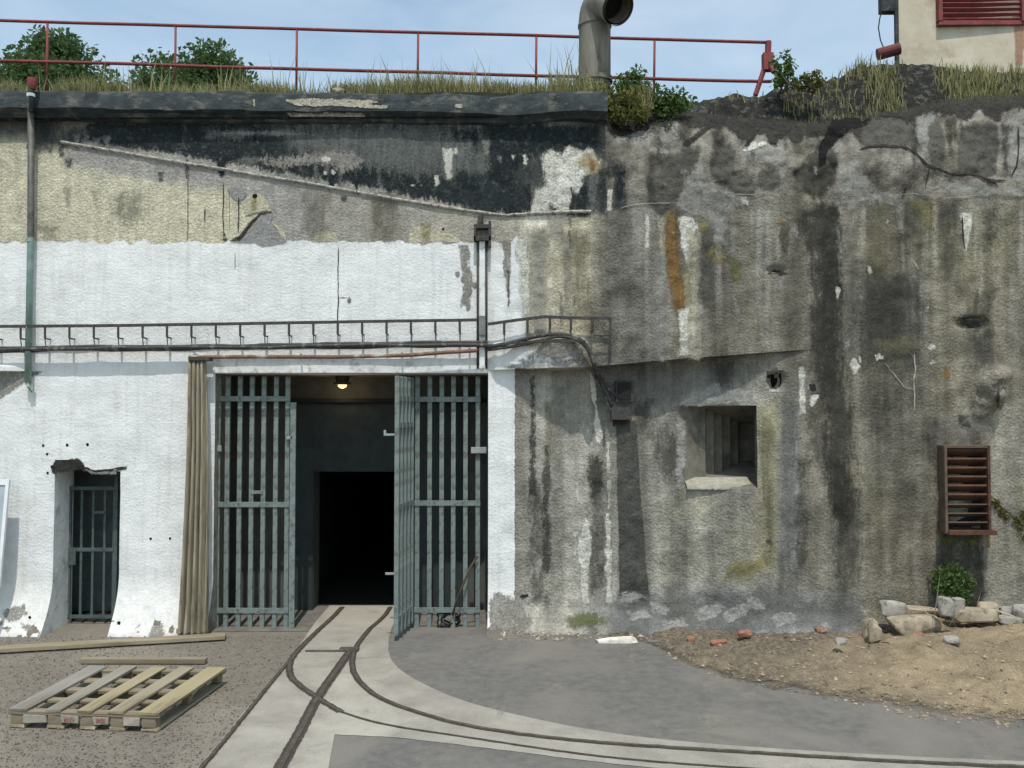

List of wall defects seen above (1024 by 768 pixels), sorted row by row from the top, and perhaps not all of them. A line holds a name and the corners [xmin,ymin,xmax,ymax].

peeling [227,188,286,246]
peeling [408,226,477,311]
leakage [39,92,1024,359]
corrosion [663,216,690,314]
crack [837,126,1024,248]
leakage [798,203,857,532]
spalling [51,458,127,474]
leakage [529,377,552,573]
leakage [573,373,649,607]
peeling [2,604,36,631]